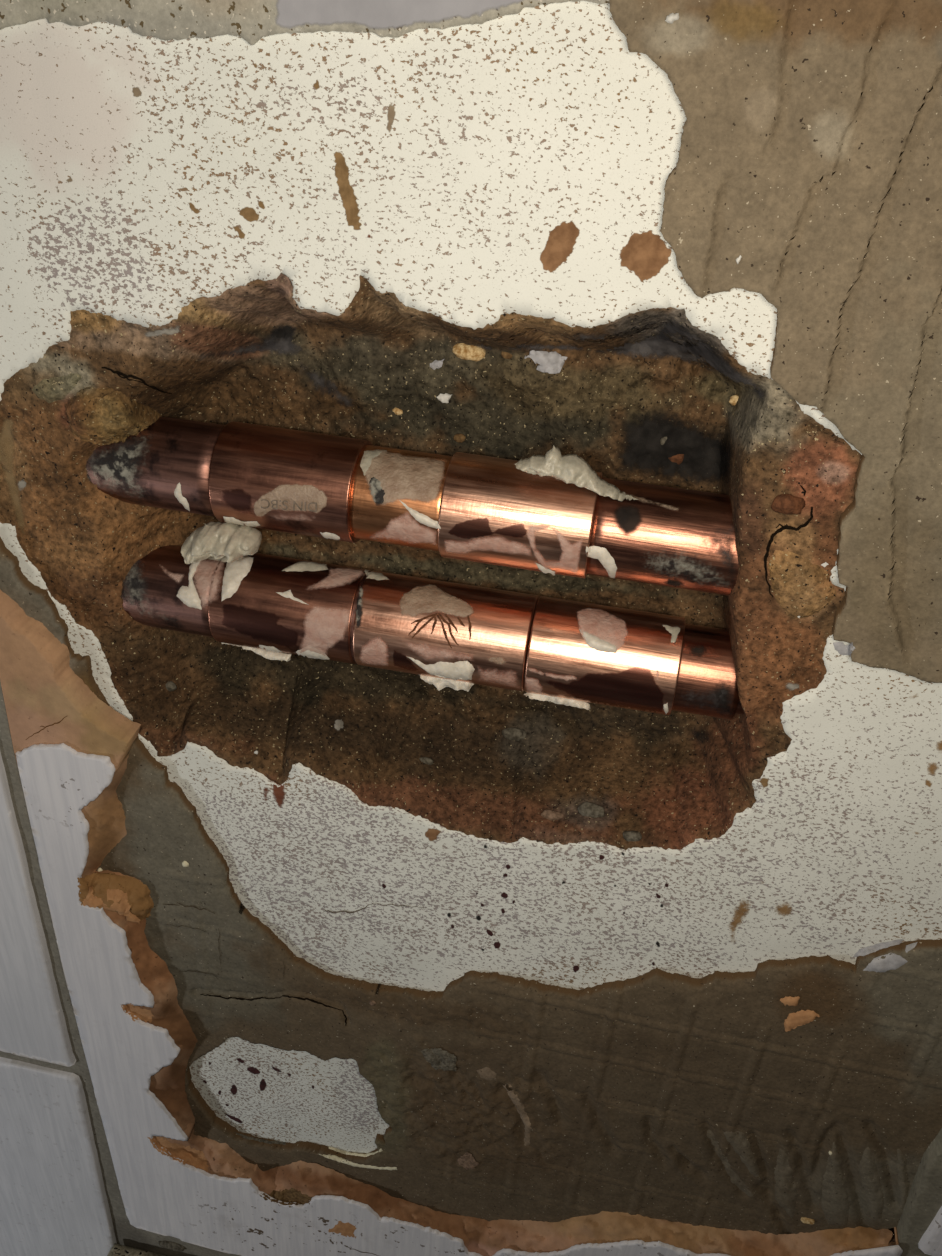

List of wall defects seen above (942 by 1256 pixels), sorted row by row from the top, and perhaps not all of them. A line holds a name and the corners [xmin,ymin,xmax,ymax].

peeling [665,13,679,24]
peeling [620,230,671,281]
crack [764,485,813,597]
spalling [0,273,861,851]
peeling [853,939,917,972]
peeling [121,1003,154,1023]
crack [81,747,893,1256]
peeling [780,996,820,1032]
peeling [147,1137,208,1172]
peeling [319,1146,397,1170]
peeling [260,1188,312,1207]